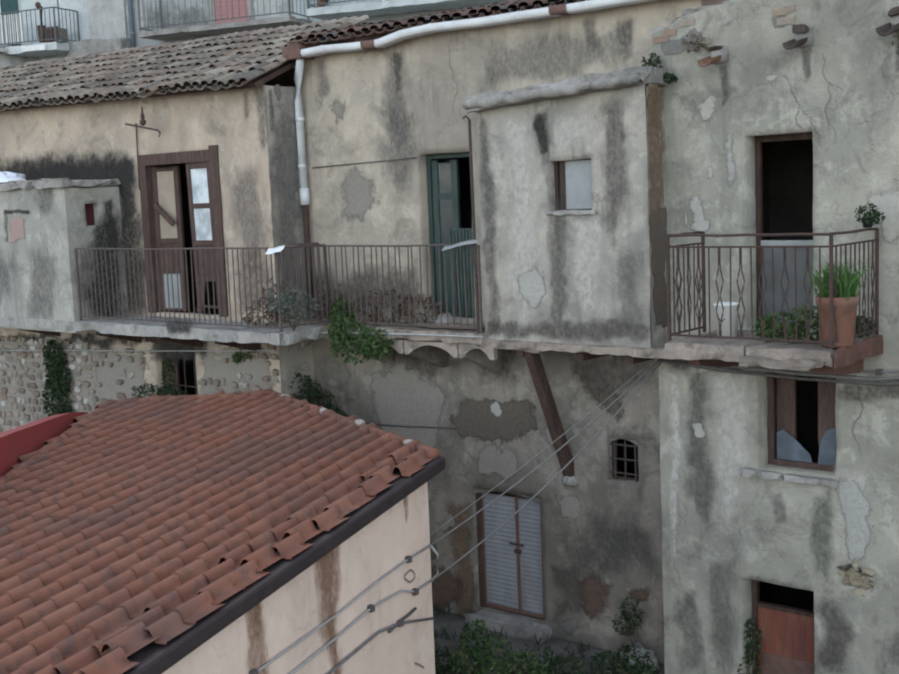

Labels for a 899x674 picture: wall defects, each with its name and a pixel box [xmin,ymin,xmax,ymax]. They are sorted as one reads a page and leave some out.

peeling [332,101,345,124]
crack [779,59,844,152]
peeling [342,167,379,222]
water stain [489,110,643,340]
peeling [684,195,710,231]
peeling [371,359,552,479]
spalling [430,504,474,615]
spalling [580,576,612,618]
spalling [837,562,877,595]